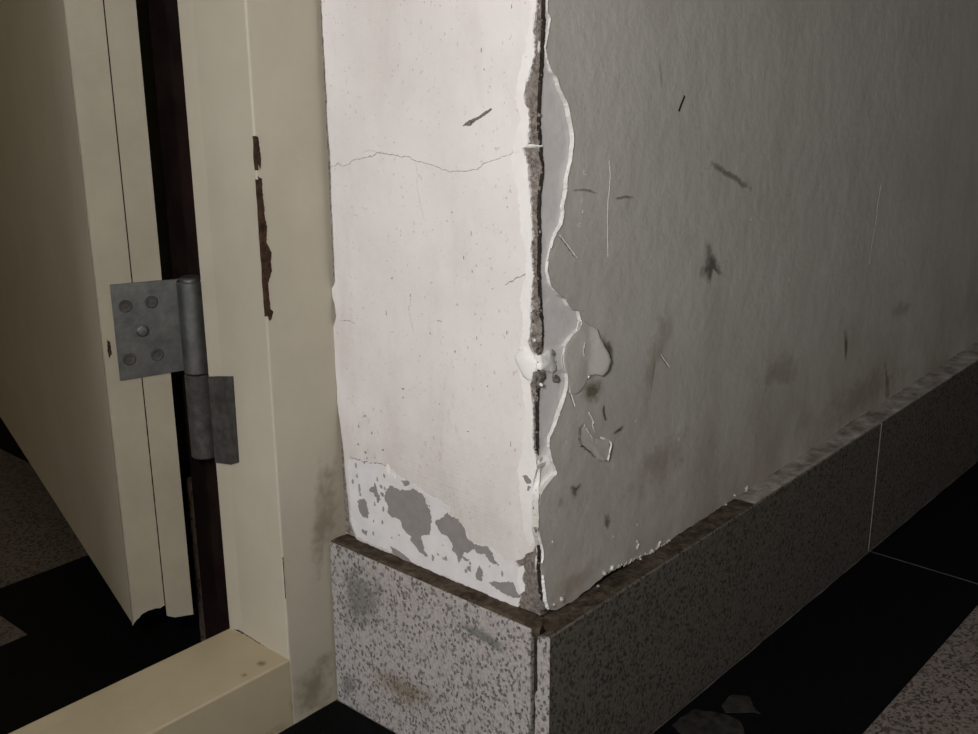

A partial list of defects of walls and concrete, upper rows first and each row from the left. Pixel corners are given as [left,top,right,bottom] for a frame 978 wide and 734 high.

crack [331,150,514,220]
spalling [252,136,273,321]
spalling [348,0,582,611]
peeling [578,412,612,461]
spalling [597,539,672,587]